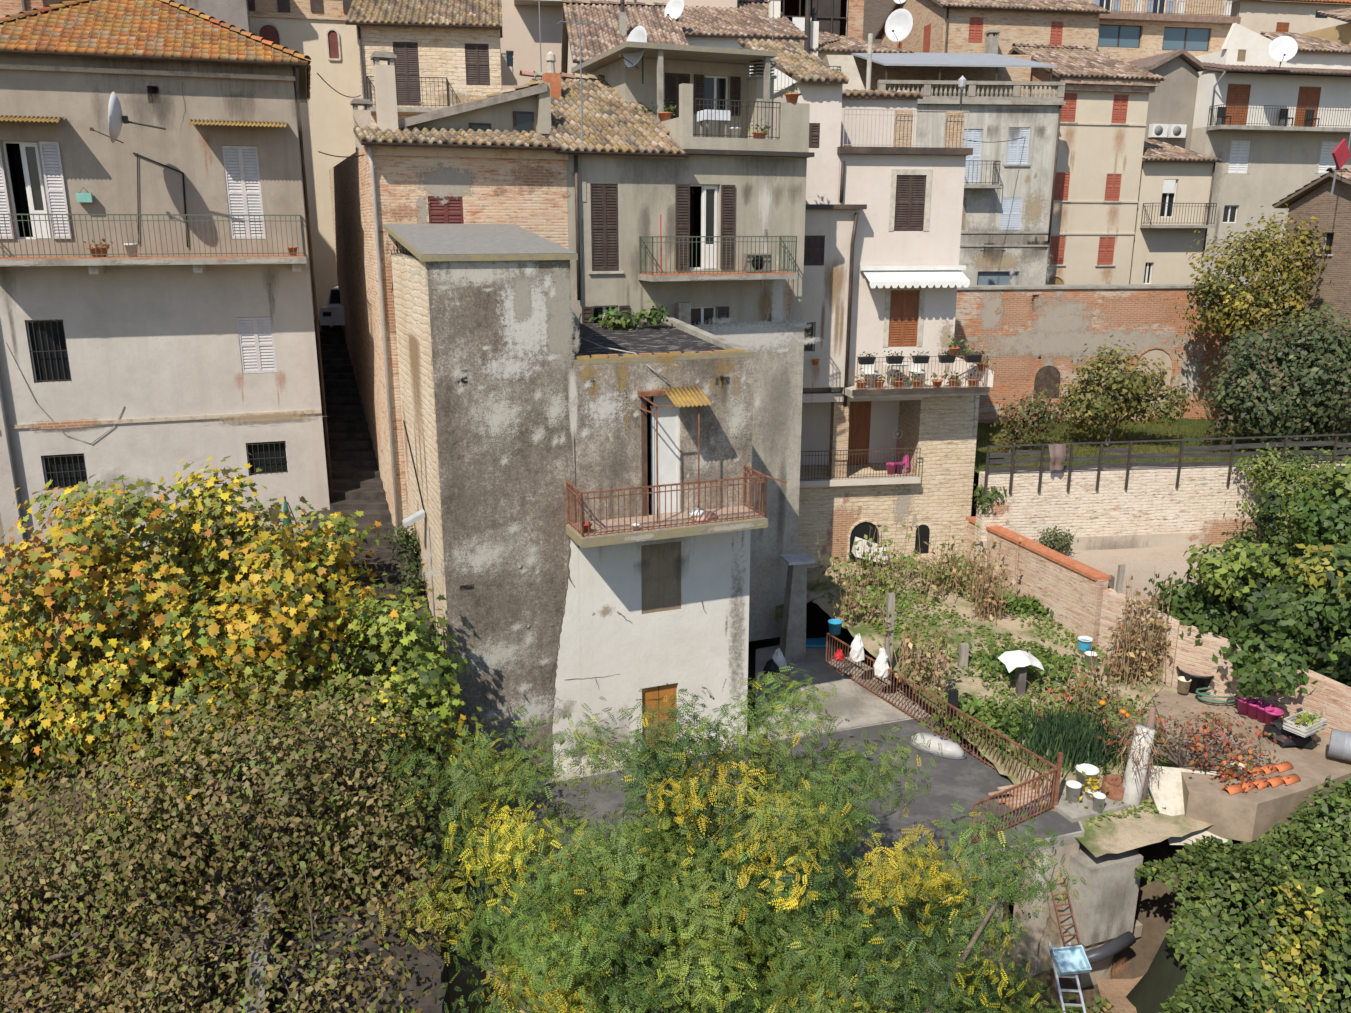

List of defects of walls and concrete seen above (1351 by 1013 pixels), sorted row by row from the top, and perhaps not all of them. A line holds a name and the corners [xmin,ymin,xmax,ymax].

flaking render [382,241,397,339]
leakage [821,264,843,345]
flaking render [1092,291,1191,334]
peeling [409,260,667,467]
peeling [402,396,542,594]